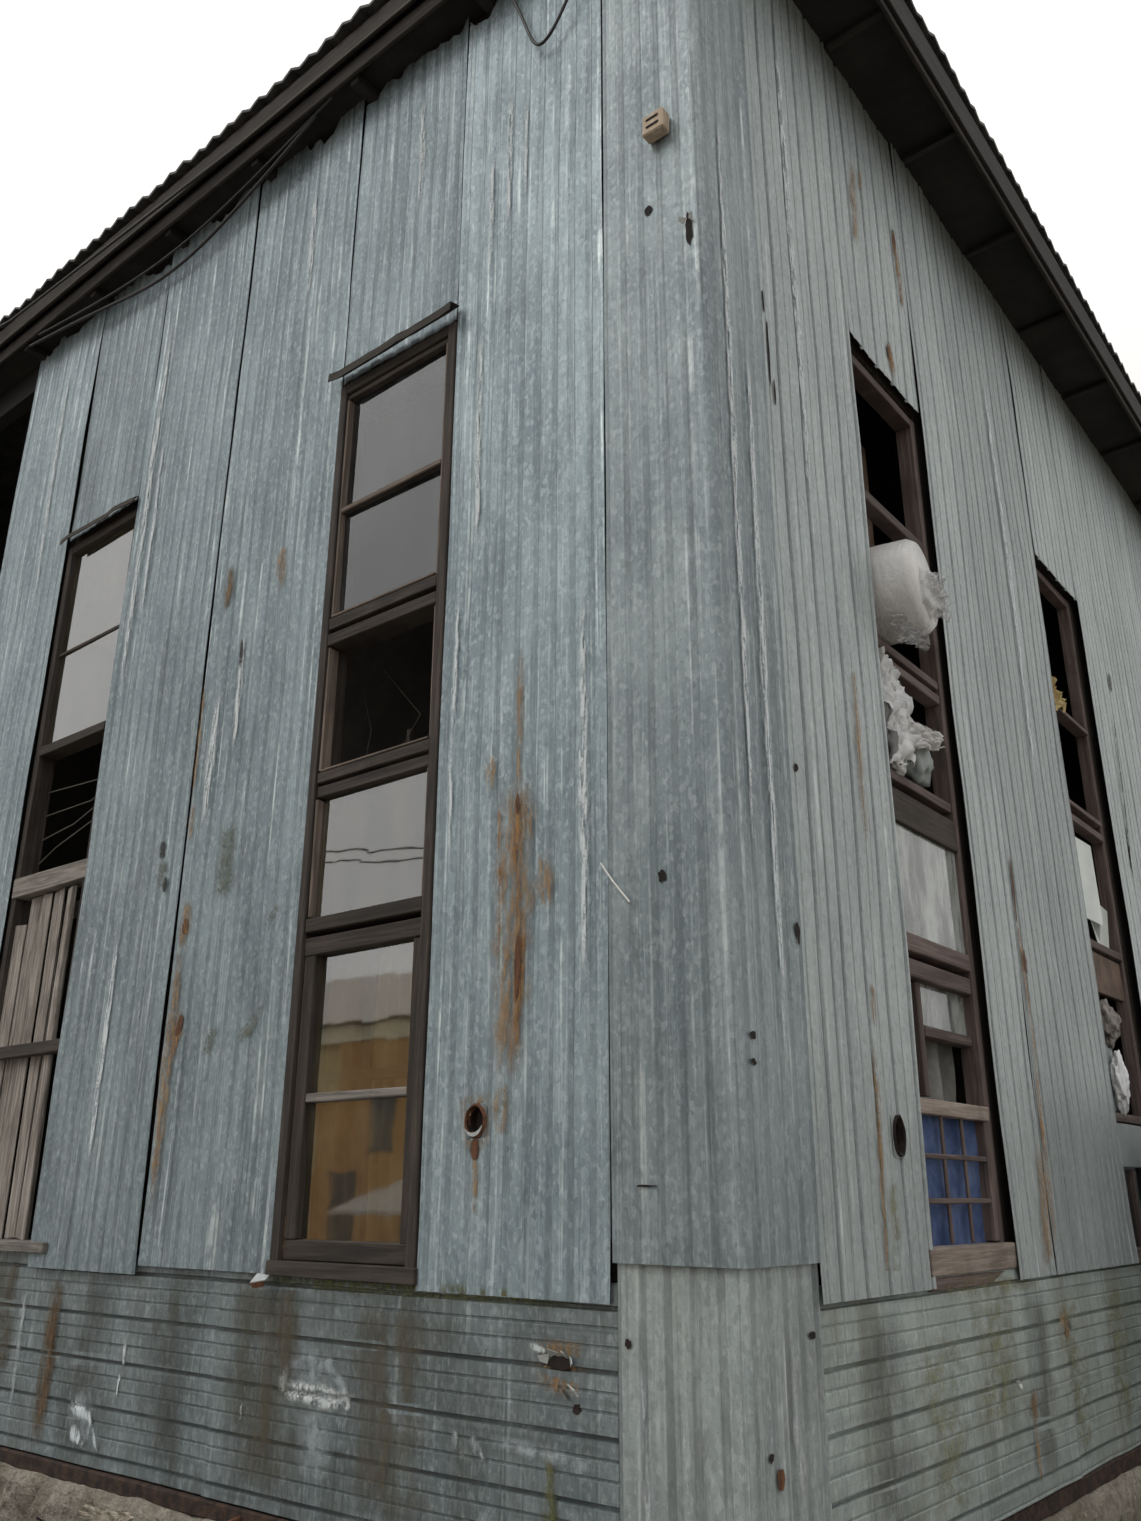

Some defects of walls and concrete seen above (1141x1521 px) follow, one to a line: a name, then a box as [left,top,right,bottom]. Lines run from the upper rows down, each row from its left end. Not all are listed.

corrosion [180,905,190,943]
corrosion [496,794,551,1054]
corrosion [171,1013,183,1055]
corrosion [468,1087,506,1210]
corrosion [32,1289,60,1429]